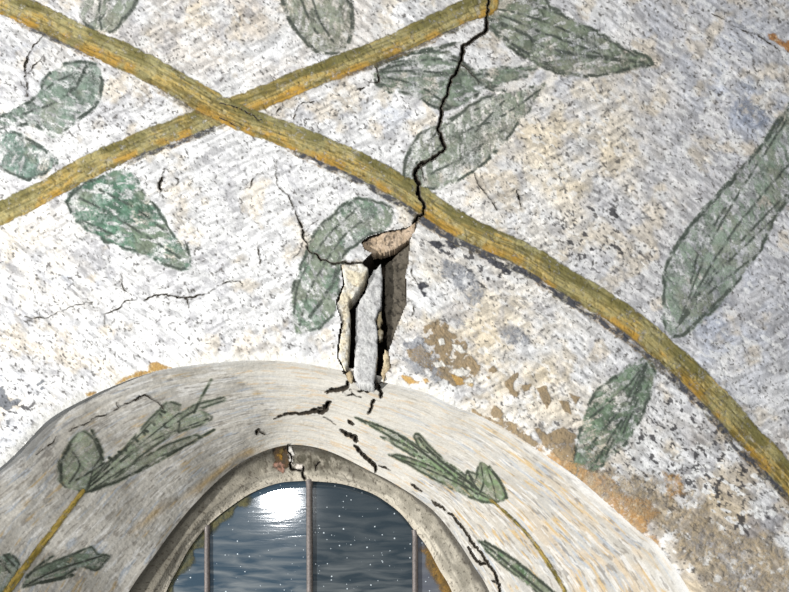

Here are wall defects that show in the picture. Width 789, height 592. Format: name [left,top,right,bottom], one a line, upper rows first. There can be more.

crack [412,0,490,224]
crack [250,161,363,265]
crack [287,445,320,479]
crack [255,380,388,473]
spalling [336,222,417,392]
peeling [407,320,497,387]
peeling [505,373,580,414]
crack [411,484,501,592]